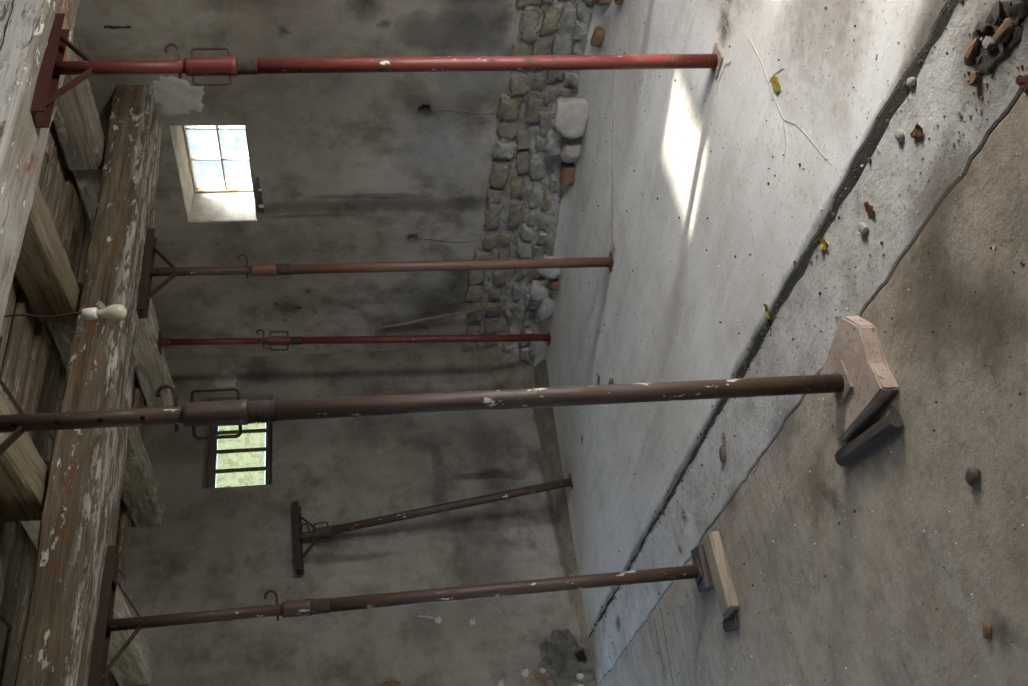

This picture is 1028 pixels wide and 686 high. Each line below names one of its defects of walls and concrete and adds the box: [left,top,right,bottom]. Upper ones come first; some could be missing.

crack [0,0,15,52]
flaking render [511,0,595,56]
crack [748,37,833,166]
flaking render [461,70,580,390]
flaking render [537,629,596,686]